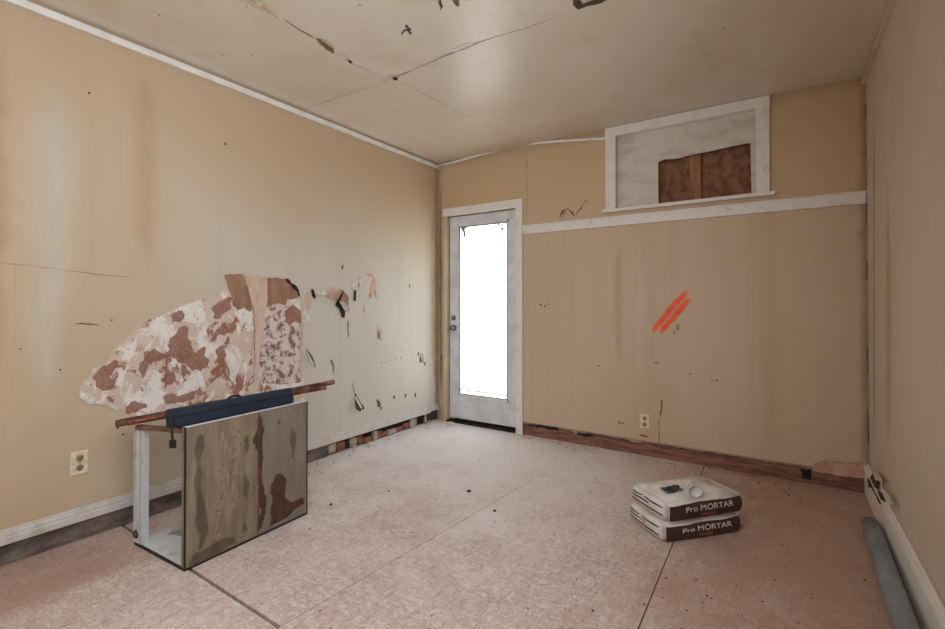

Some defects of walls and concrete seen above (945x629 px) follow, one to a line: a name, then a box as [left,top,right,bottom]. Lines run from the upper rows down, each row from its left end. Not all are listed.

peeling [429,0,468,12]
peeling [573,0,606,10]
peeling [78,272,349,416]
spalling [327,415,428,455]